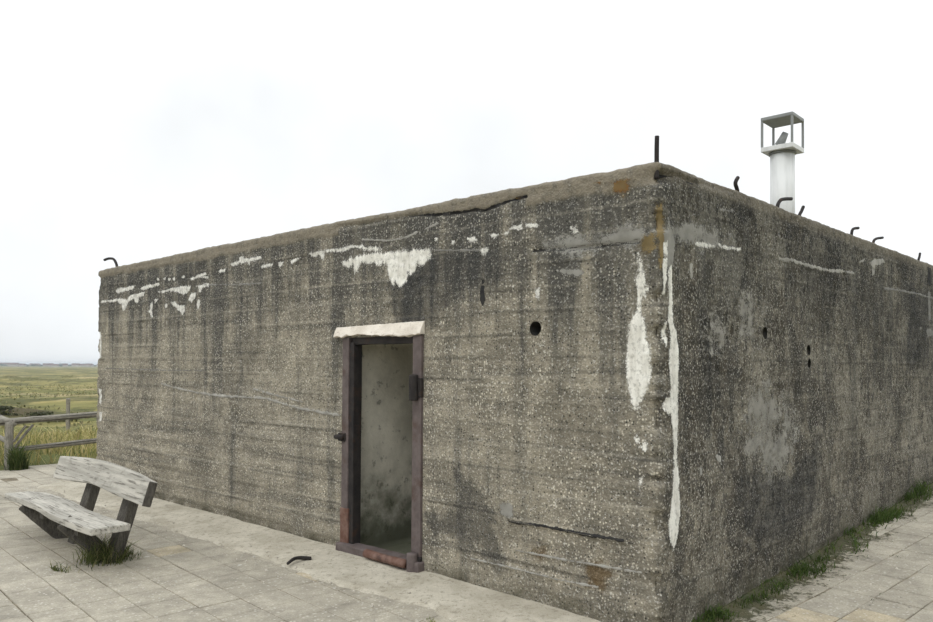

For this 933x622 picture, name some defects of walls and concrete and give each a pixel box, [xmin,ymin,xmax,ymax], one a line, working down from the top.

crack [396,195,528,220]
rust [640,204,666,269]
efflorescence [543,221,719,552]
crack [509,520,624,542]